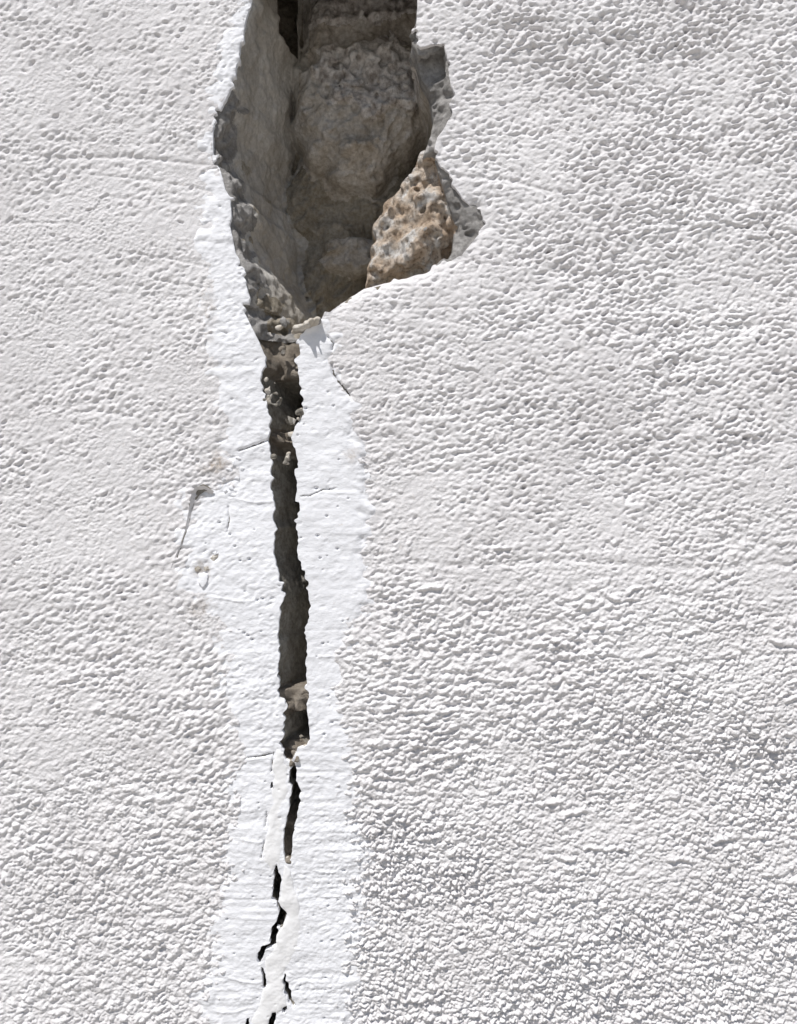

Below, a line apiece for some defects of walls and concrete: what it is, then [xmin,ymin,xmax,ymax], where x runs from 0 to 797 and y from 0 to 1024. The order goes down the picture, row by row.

spalling [214,0,485,344]
crack [242,339,332,1024]